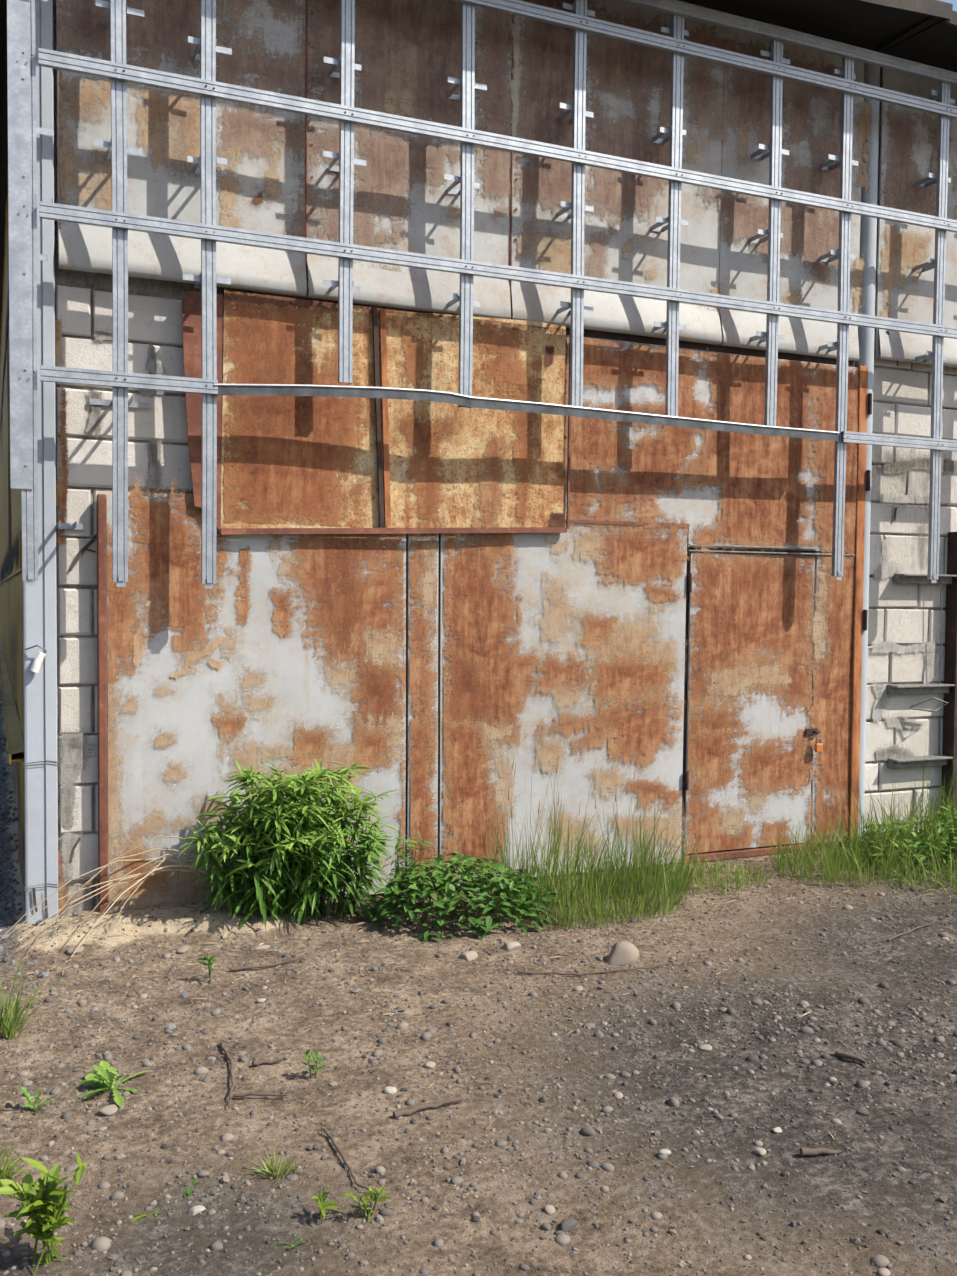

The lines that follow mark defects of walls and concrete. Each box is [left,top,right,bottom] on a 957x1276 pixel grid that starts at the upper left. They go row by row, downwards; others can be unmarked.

rust [57,0,110,61]
rust [126,0,200,73]
rust [58,69,112,211]
rust [130,85,200,177]
rust [216,0,957,318]
rust [107,286,859,913]
peeling [170,637,223,679]